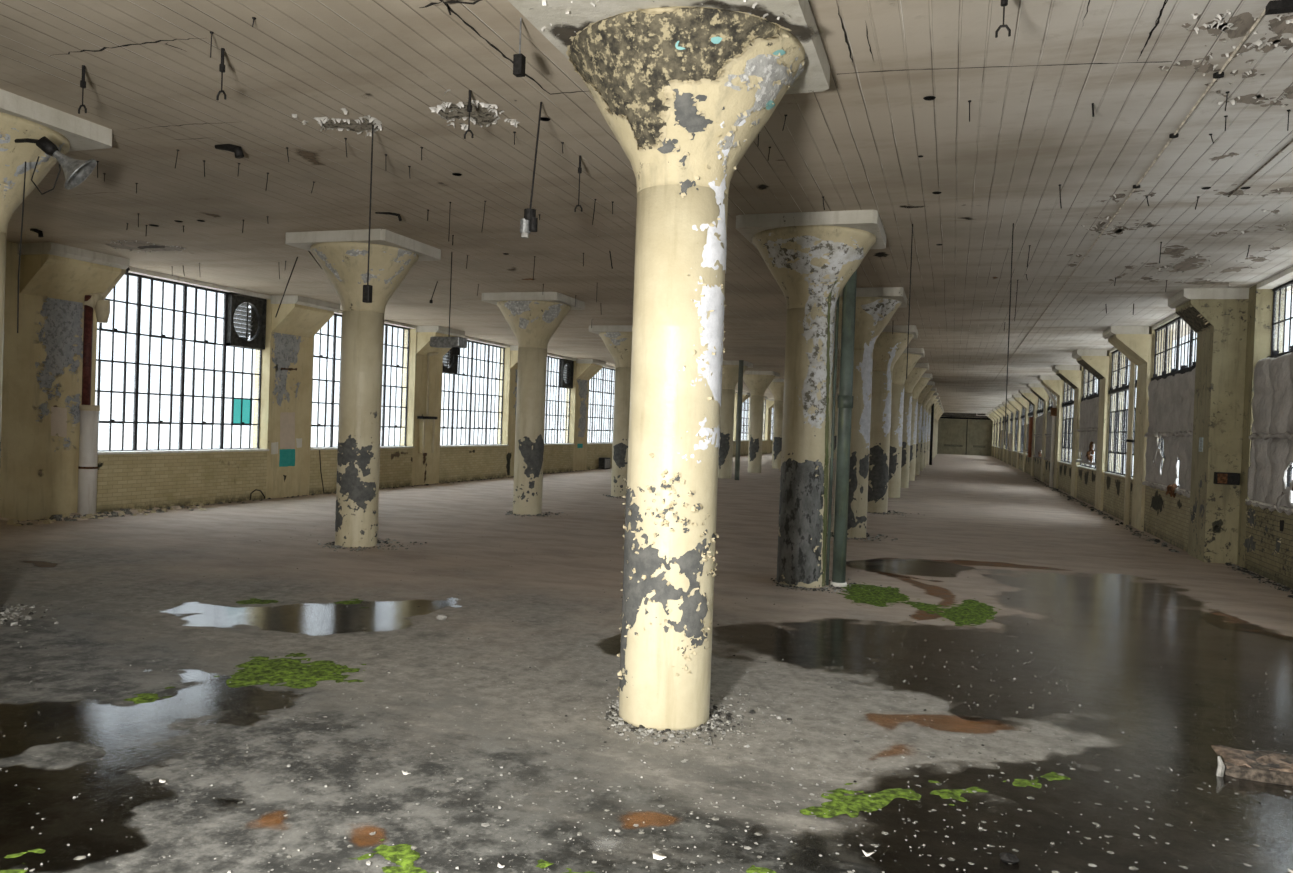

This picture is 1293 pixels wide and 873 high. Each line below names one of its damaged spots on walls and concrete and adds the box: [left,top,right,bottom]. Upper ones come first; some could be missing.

spalling [429,89,520,130]
crack [420,0,586,95]
peeling [1158,9,1293,108]
peeling [32,295,84,452]
peeling [334,411,379,546]
peeling [513,369,545,504]
spalling [530,0,806,698]
peeling [749,435,830,587]
peeling [758,230,865,450]
peeling [847,298,931,535]